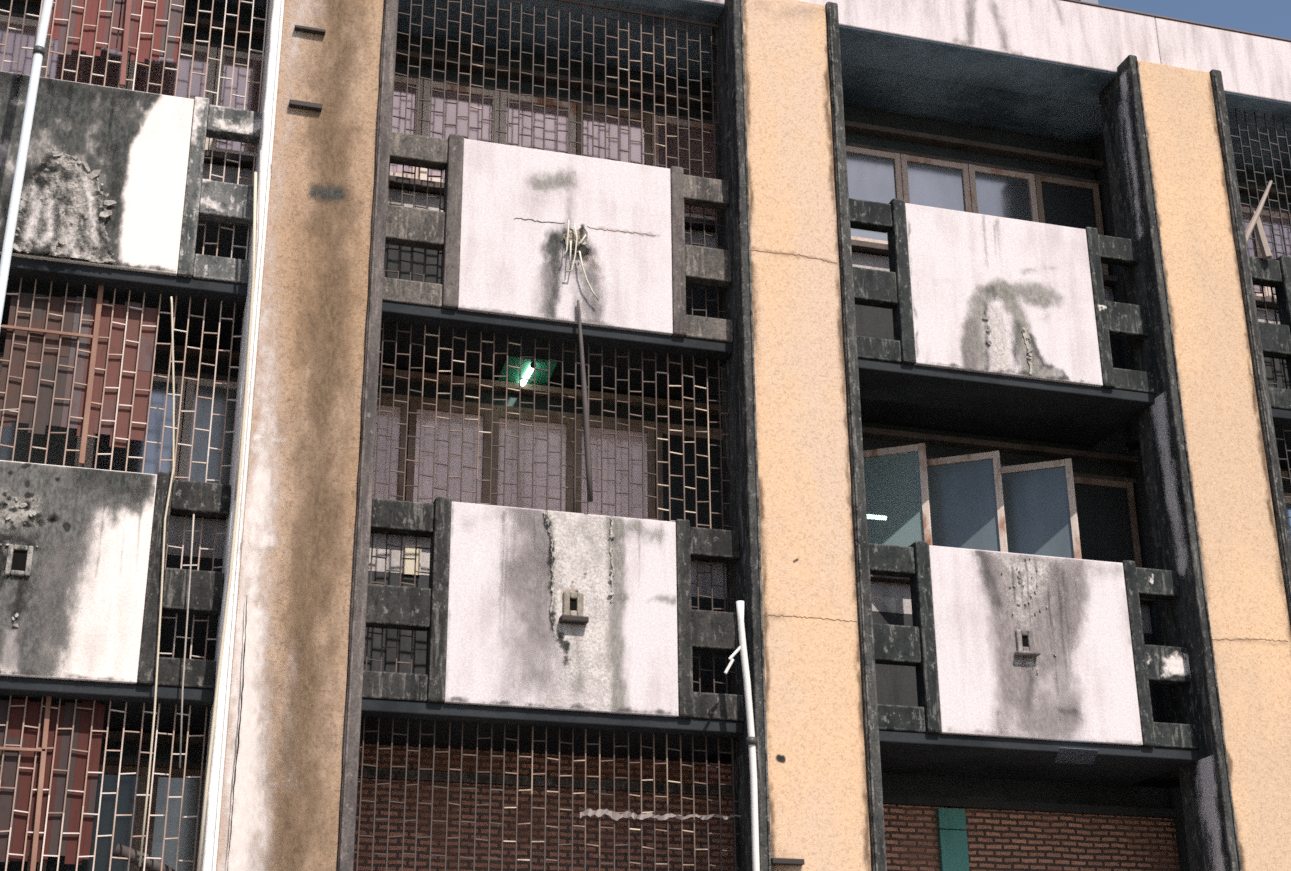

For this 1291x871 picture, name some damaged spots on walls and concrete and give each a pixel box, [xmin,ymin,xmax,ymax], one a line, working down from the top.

leakage [963,0,975,44]
leakage [0,71,161,270]
leakage [533,173,571,189]
leakage [542,228,602,320]
spalling [562,220,599,300]
leakage [963,279,1069,380]
flaking render [0,463,71,552]
leakage [0,461,155,676]
leakage [217,311,279,871]
leakage [507,507,557,688]
leakage [607,517,660,712]
leakage [977,551,1086,739]